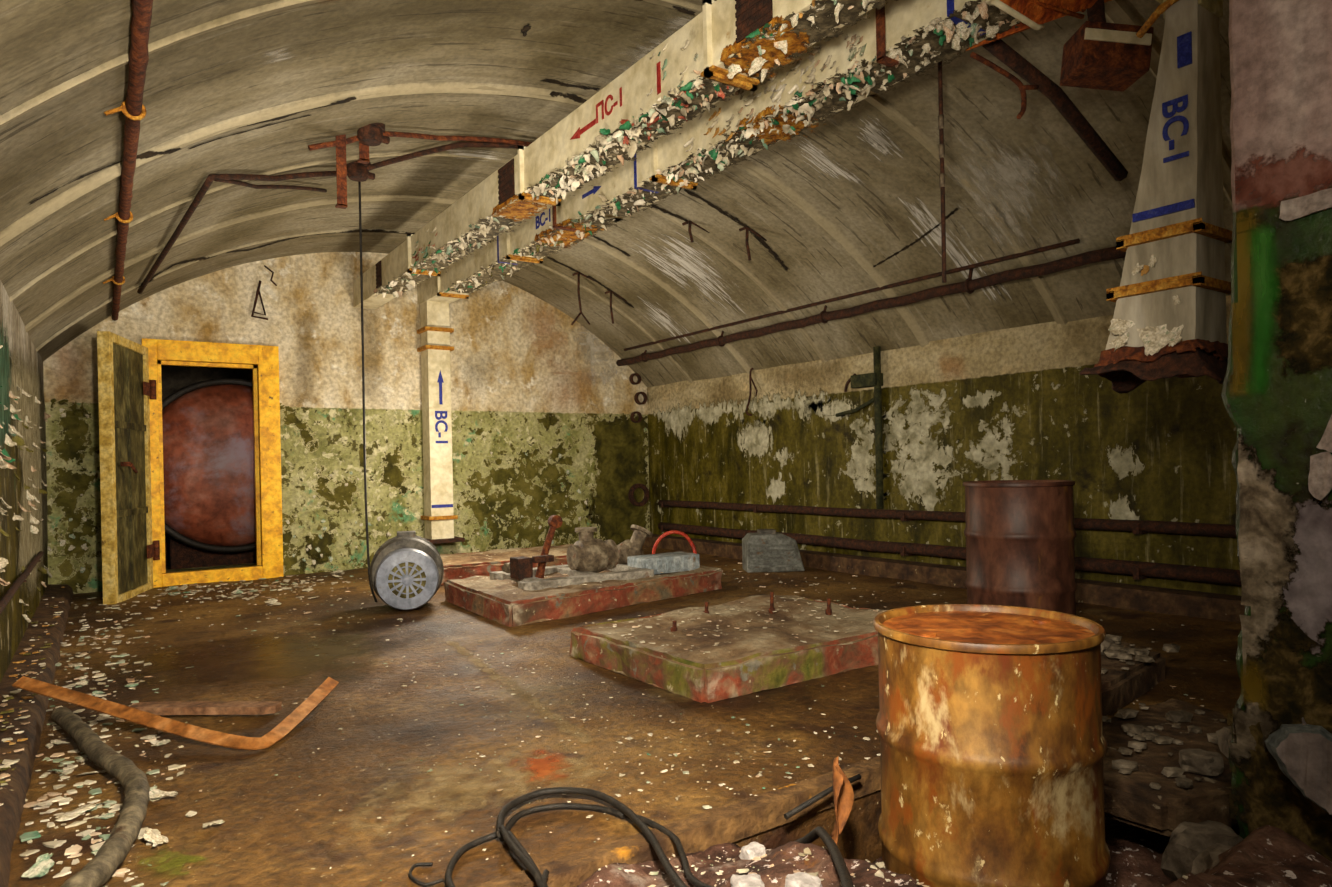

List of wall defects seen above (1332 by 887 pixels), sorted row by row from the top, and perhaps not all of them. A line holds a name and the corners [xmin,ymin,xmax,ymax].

peeling [444,0,1009,294]
peeling [373,215,513,298]
peeling [1108,318,1184,356]
peeling [0,300,101,622]
peeling [457,381,1022,551]
peeling [1105,443,1146,520]
spalling [1229,433,1332,764]
peeling [54,802,97,821]
peeling [21,853,55,878]